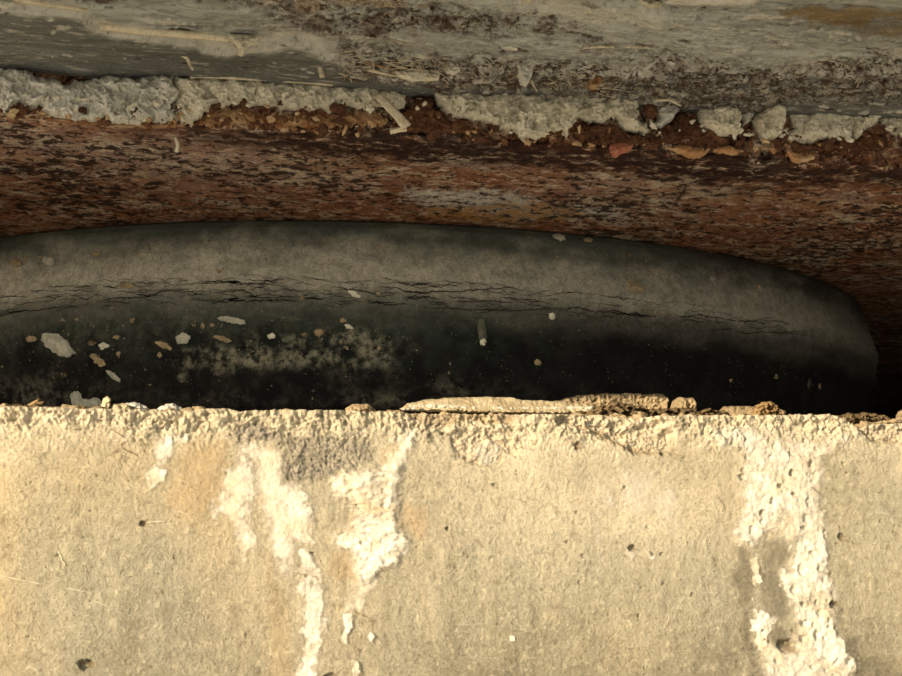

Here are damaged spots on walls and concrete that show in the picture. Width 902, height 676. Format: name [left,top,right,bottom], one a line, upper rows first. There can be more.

rust [642,104,659,120]
rust [609,143,633,158]
rust [666,145,740,160]
rust [787,150,815,164]
crack [0,274,806,336]
water stain [145,432,189,489]
water stain [213,443,327,676]
water stain [332,429,416,644]
water stain [715,427,902,676]